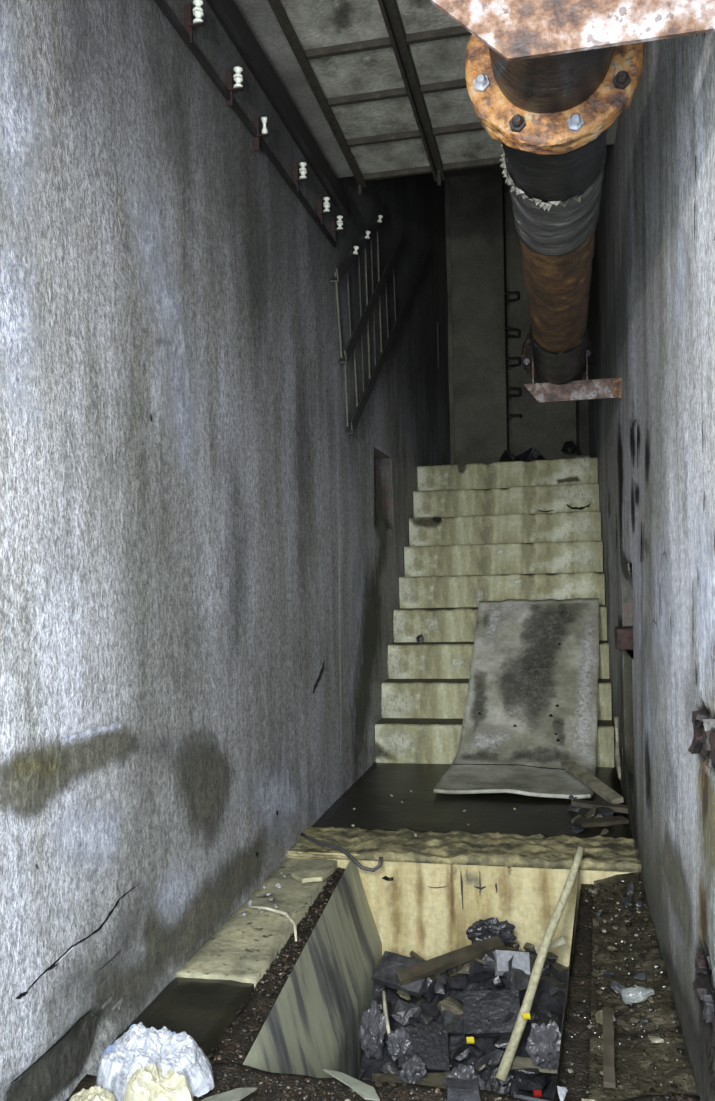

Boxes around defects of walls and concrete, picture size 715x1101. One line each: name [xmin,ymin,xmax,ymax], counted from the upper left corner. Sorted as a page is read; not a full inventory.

crack [16,884,139,999]